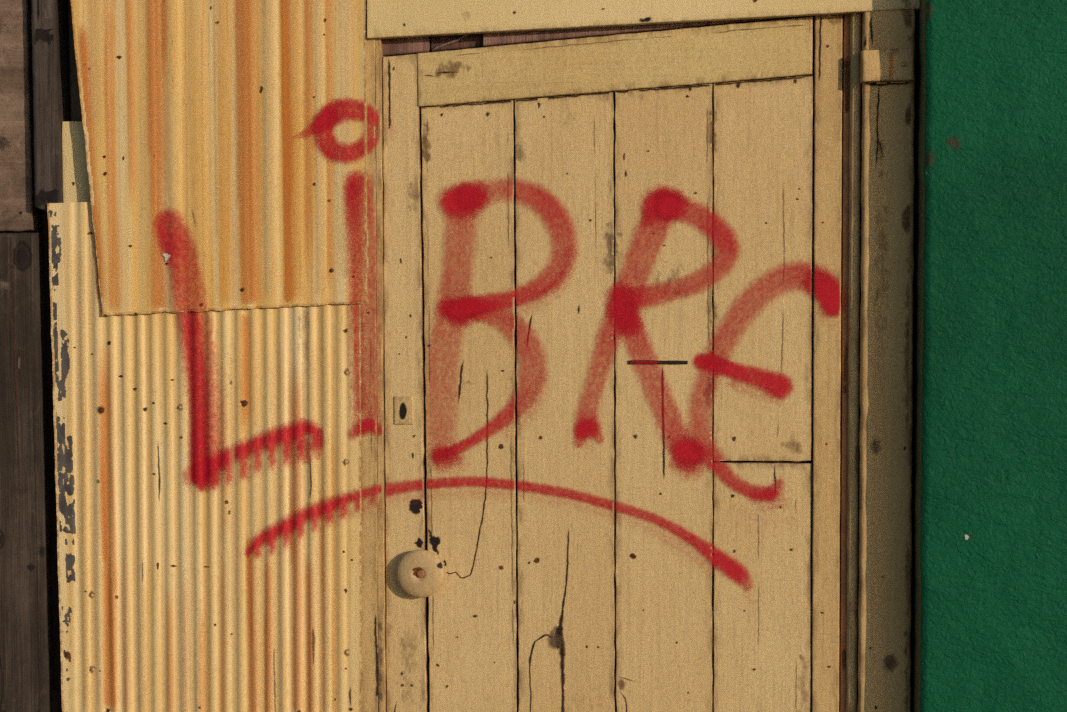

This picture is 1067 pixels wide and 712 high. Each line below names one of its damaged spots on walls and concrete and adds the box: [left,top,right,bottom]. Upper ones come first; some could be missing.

peeling [49,210,70,401]
rust [81,35,107,190]
rust [88,205,101,295]
rust [150,0,169,307]
rust [237,0,263,301]
rust [282,0,292,300]
peeling [57,416,76,583]
rust [97,393,118,622]
crack [428,364,524,581]
crack [513,532,569,712]